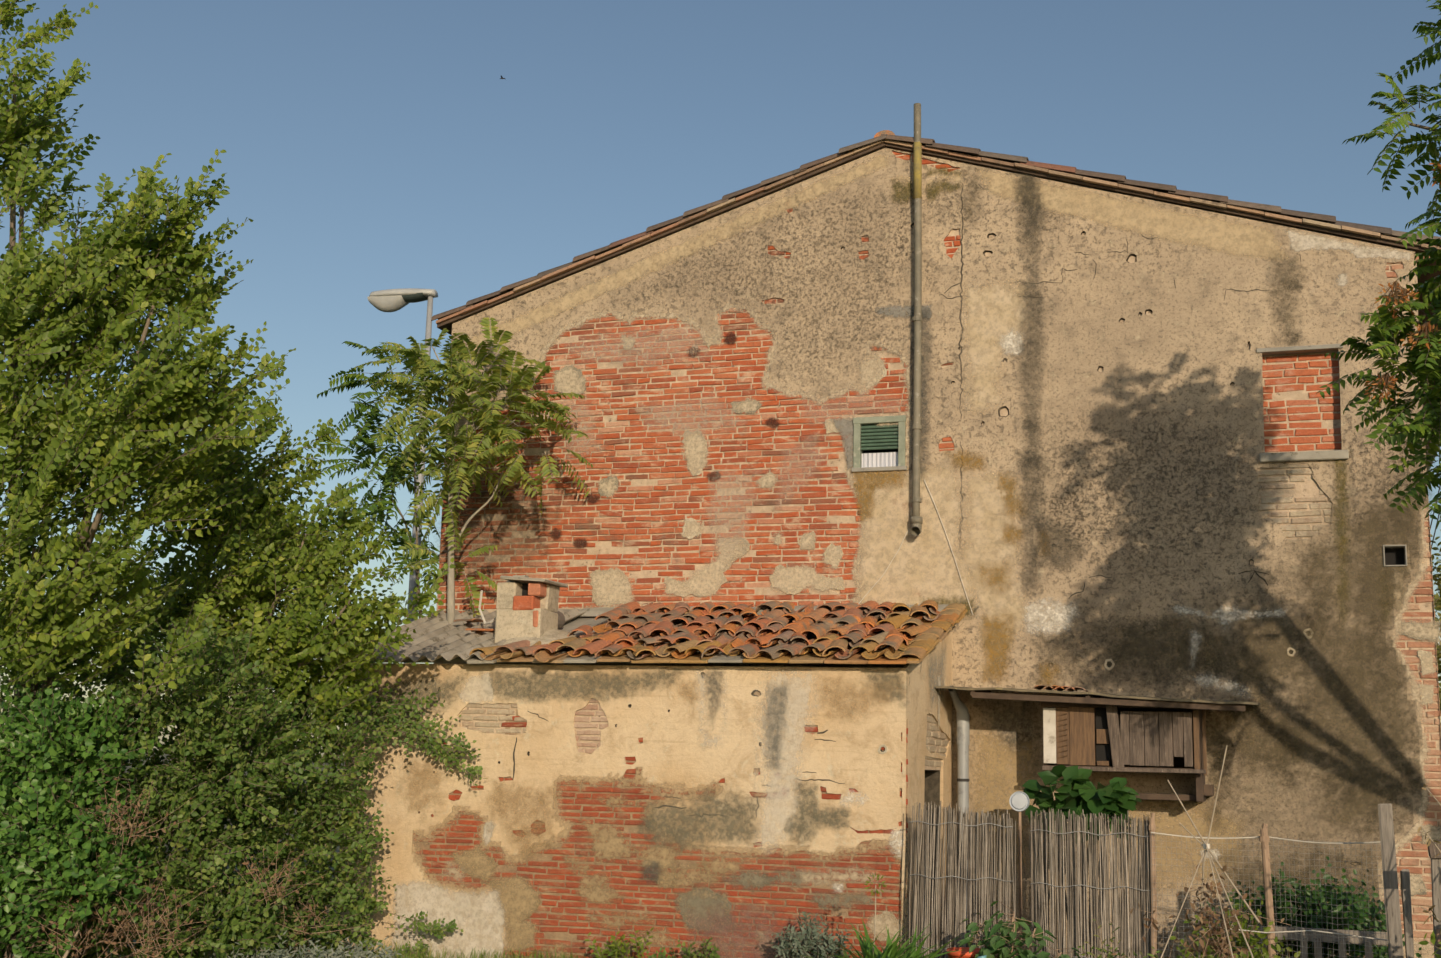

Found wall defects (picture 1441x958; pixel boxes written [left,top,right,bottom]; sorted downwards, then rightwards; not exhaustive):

spalling [944,229,961,259]
crack [941,182,1167,554]
flaking render [437,298,912,632]
spalling [458,703,527,735]
spalling [574,698,617,755]
flaking render [412,719,908,958]
damp [762,673,810,843]
spalling [925,714,949,770]
efflorescence [1025,598,1077,632]
damp [1109,442,1426,919]
flaking render [1380,499,1441,950]